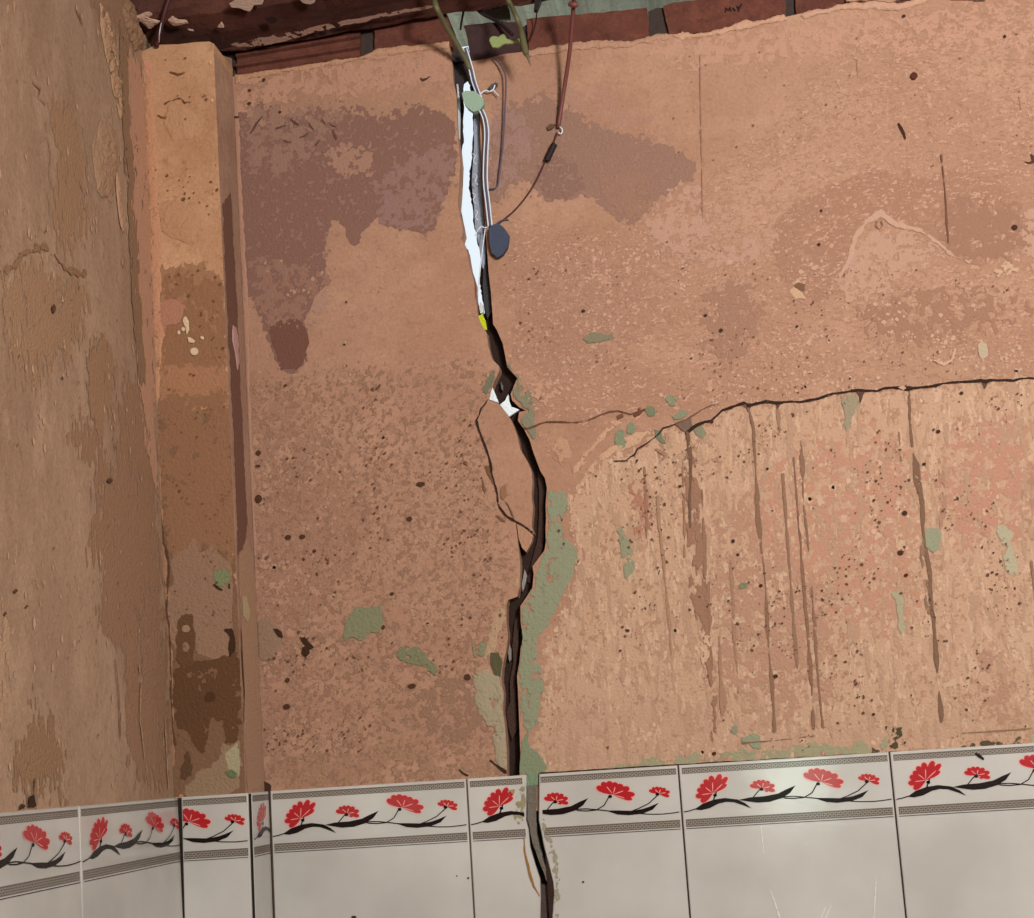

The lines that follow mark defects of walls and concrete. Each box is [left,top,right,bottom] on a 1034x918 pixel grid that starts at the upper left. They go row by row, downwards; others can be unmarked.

spalling [229,0,264,11]
leakage [487,65,697,226]
crack [697,55,705,225]
leakage [498,233,681,399]
leakage [0,0,461,811]
crack [460,81,1034,776]
leakage [531,165,1034,772]
flaking render [343,363,1034,776]
crack [523,811,547,896]